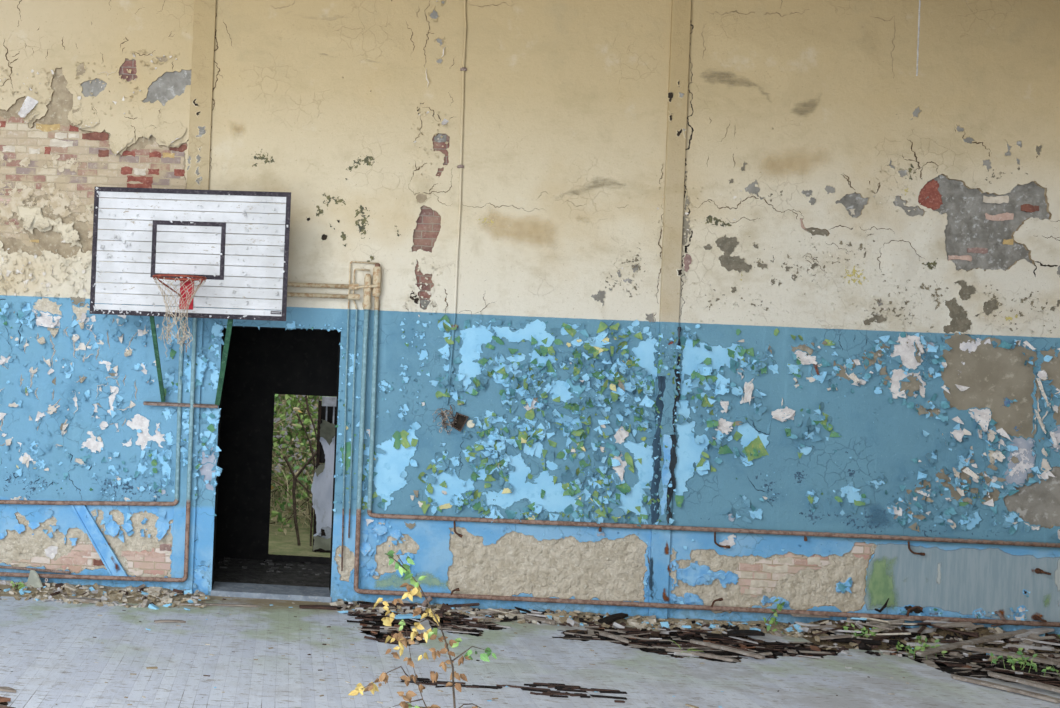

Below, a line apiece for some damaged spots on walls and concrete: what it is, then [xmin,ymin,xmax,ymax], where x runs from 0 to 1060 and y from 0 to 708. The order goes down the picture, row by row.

crack [2,0,174,88]
crack [406,1,454,68]
crack [413,97,453,170]
crack [654,0,805,323]
crack [902,139,922,179]
crack [803,225,894,271]
crack [1033,220,1060,276]
peeling [0,49,1060,613]
peeling [897,604,943,628]
peeling [959,589,1035,631]